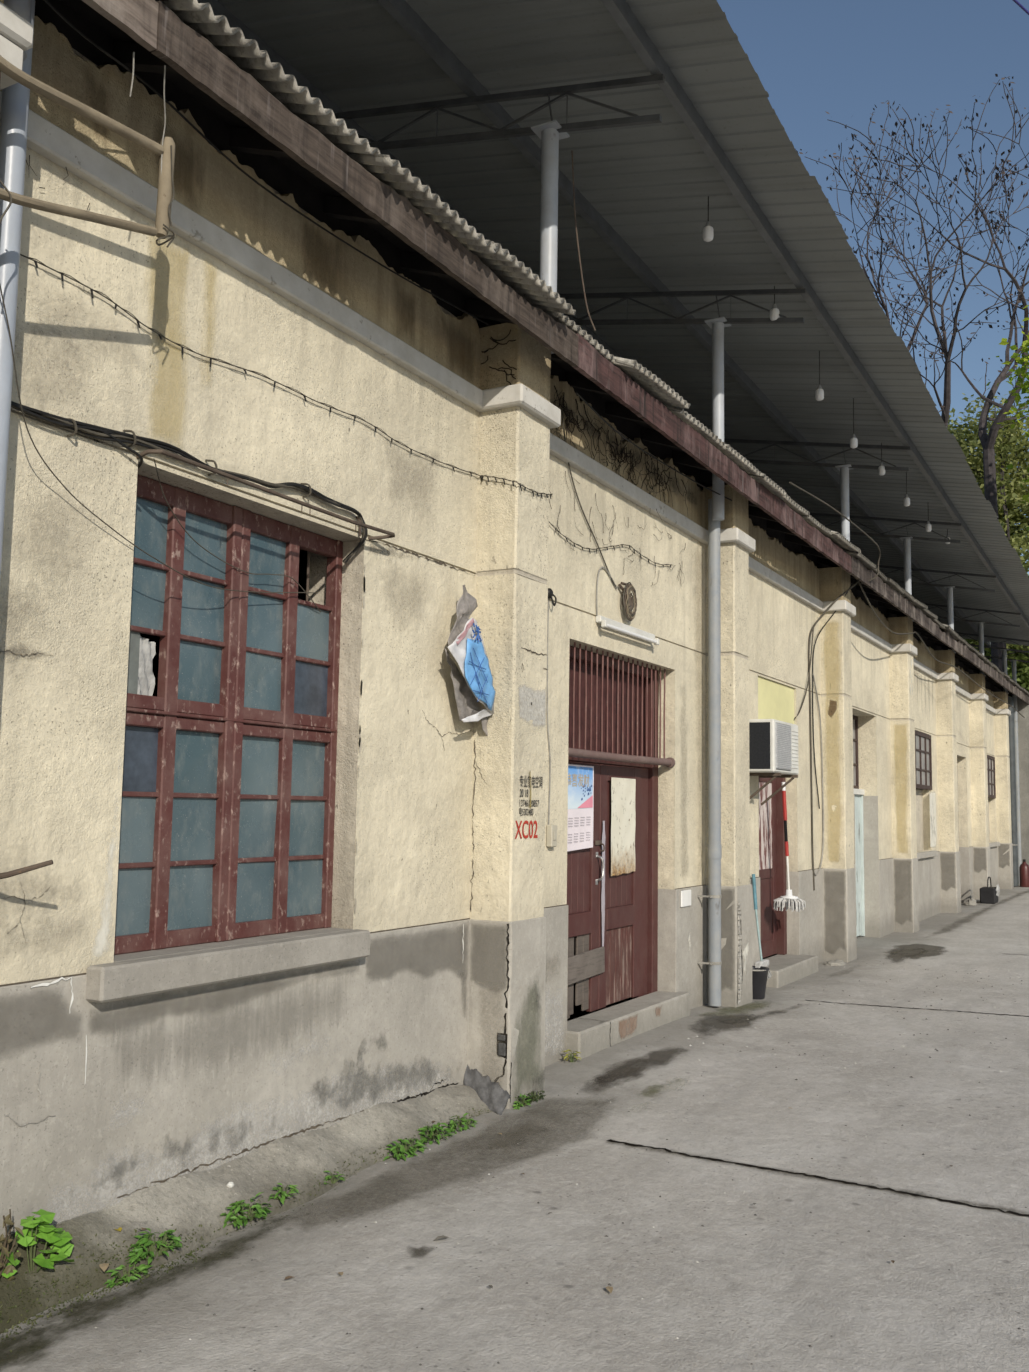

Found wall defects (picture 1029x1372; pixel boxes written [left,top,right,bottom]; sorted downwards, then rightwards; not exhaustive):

leakage [54,1068,440,1216]
crack [607,1139,1029,1216]